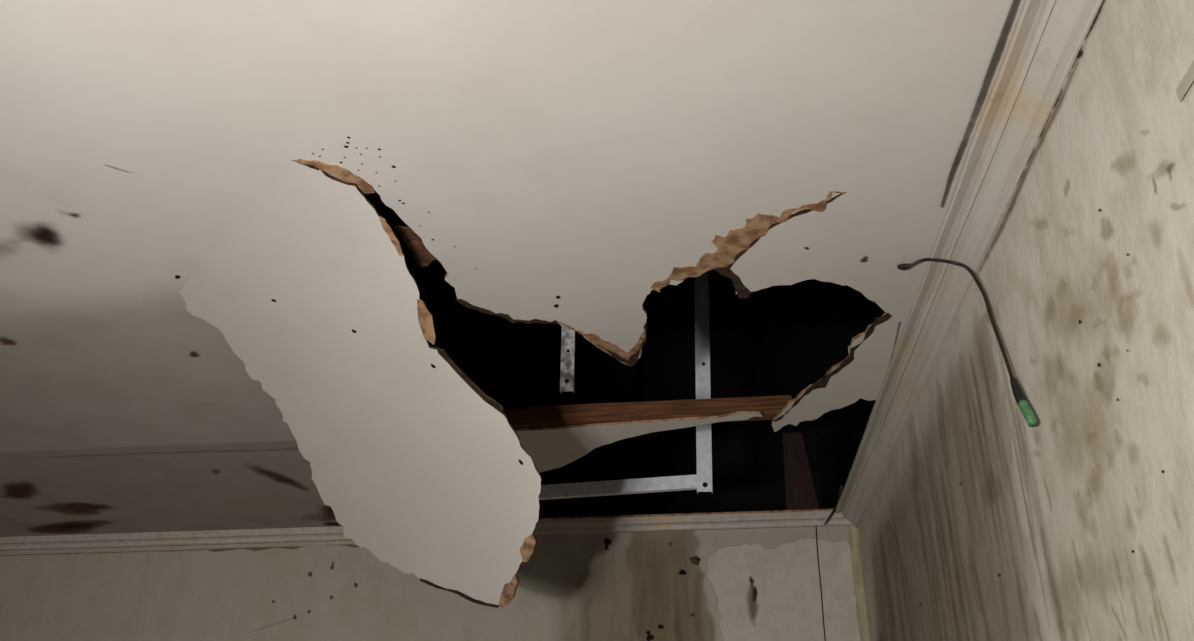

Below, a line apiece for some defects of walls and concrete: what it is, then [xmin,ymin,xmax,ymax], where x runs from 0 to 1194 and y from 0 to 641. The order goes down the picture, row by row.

water stain [29,229,55,243]
peeling [379,216,438,267]
spalling [714,266,751,299]
peeling [417,299,436,345]
spalling [456,298,647,367]
spalling [774,313,892,422]
water stain [8,486,33,498]
water stain [257,470,296,486]
water stain [31,504,108,533]
water stain [323,507,340,526]
peeling [520,534,538,563]
peeling [499,575,519,608]